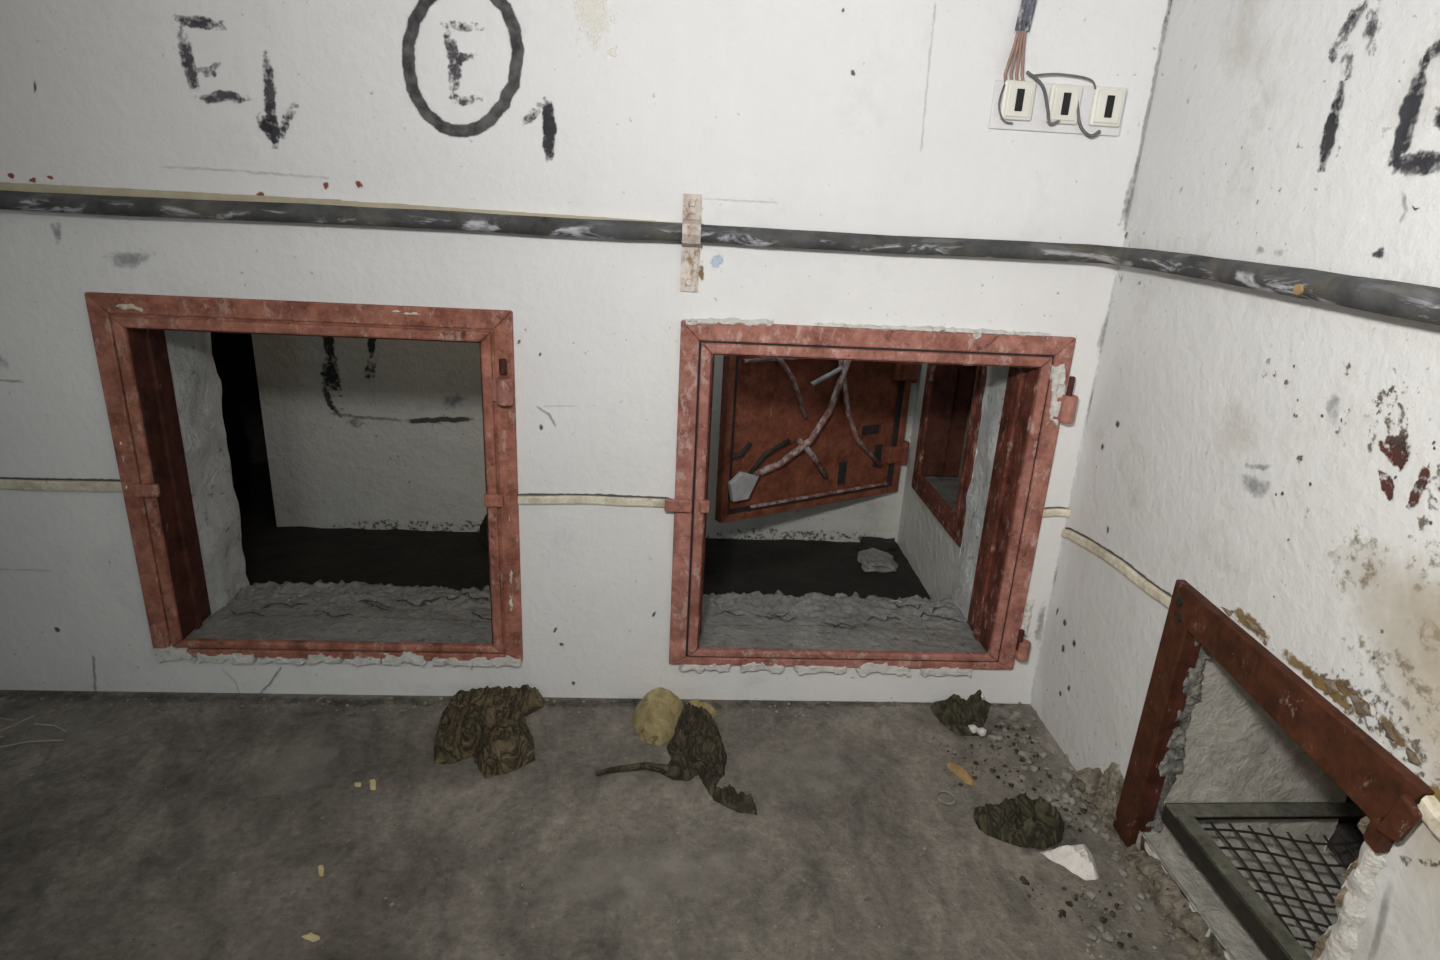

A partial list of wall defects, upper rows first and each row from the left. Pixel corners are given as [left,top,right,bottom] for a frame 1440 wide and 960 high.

spalling [1221,607,1267,638]
spalling [1322,678,1422,768]
spalling [1073,637,1231,960]
spalling [1310,816,1394,960]